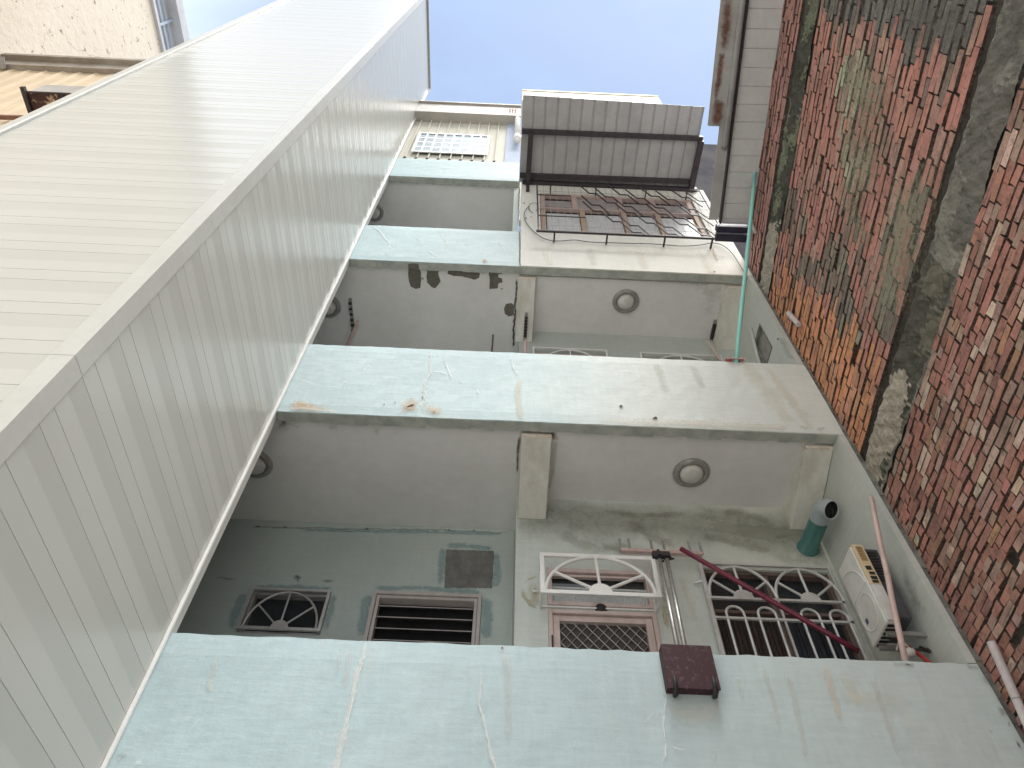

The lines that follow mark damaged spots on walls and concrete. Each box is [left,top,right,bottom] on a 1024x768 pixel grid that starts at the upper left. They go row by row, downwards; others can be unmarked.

rust [713,2,730,123]
peeling [408,263,503,289]
crack [511,187,521,374]
damp [696,516,804,543]
crack [333,647,366,768]
crack [478,678,496,768]